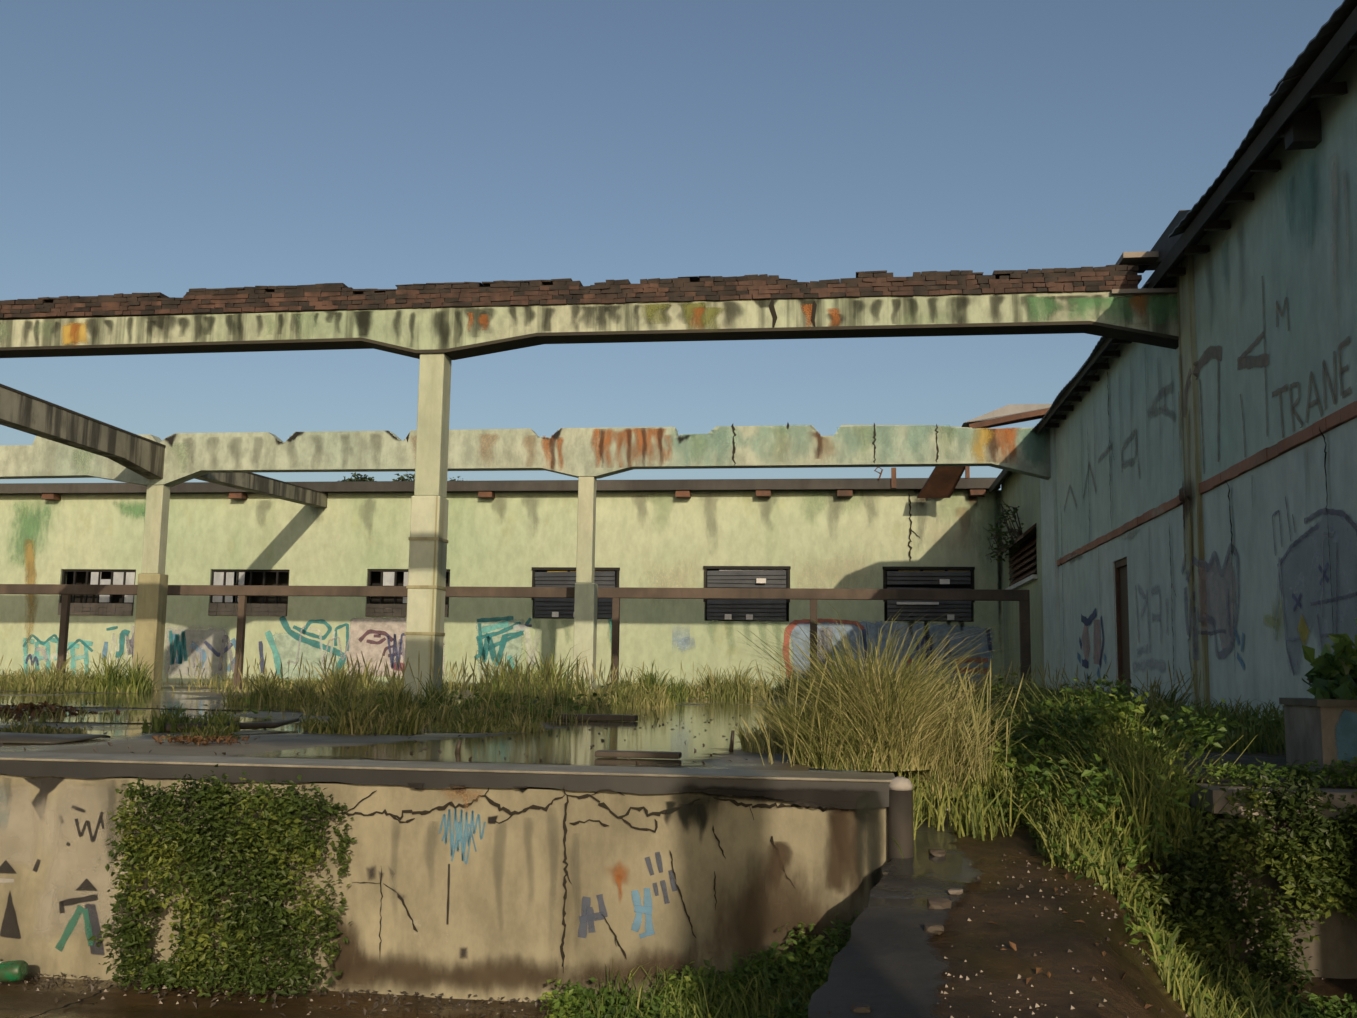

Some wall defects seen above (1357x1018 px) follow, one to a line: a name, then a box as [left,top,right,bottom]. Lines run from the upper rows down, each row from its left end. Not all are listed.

rust [63,323,86,344]
leakage [148,314,241,336]
leakage [279,311,370,336]
leakage [510,306,553,326]
rust [543,435,562,468]
rust [593,428,672,462]
crack [729,424,737,465]
crack [870,423,878,464]
crack [908,495,920,560]
leakage [828,791,882,889]
crack [340,787,856,973]
leakage [715,842,846,967]